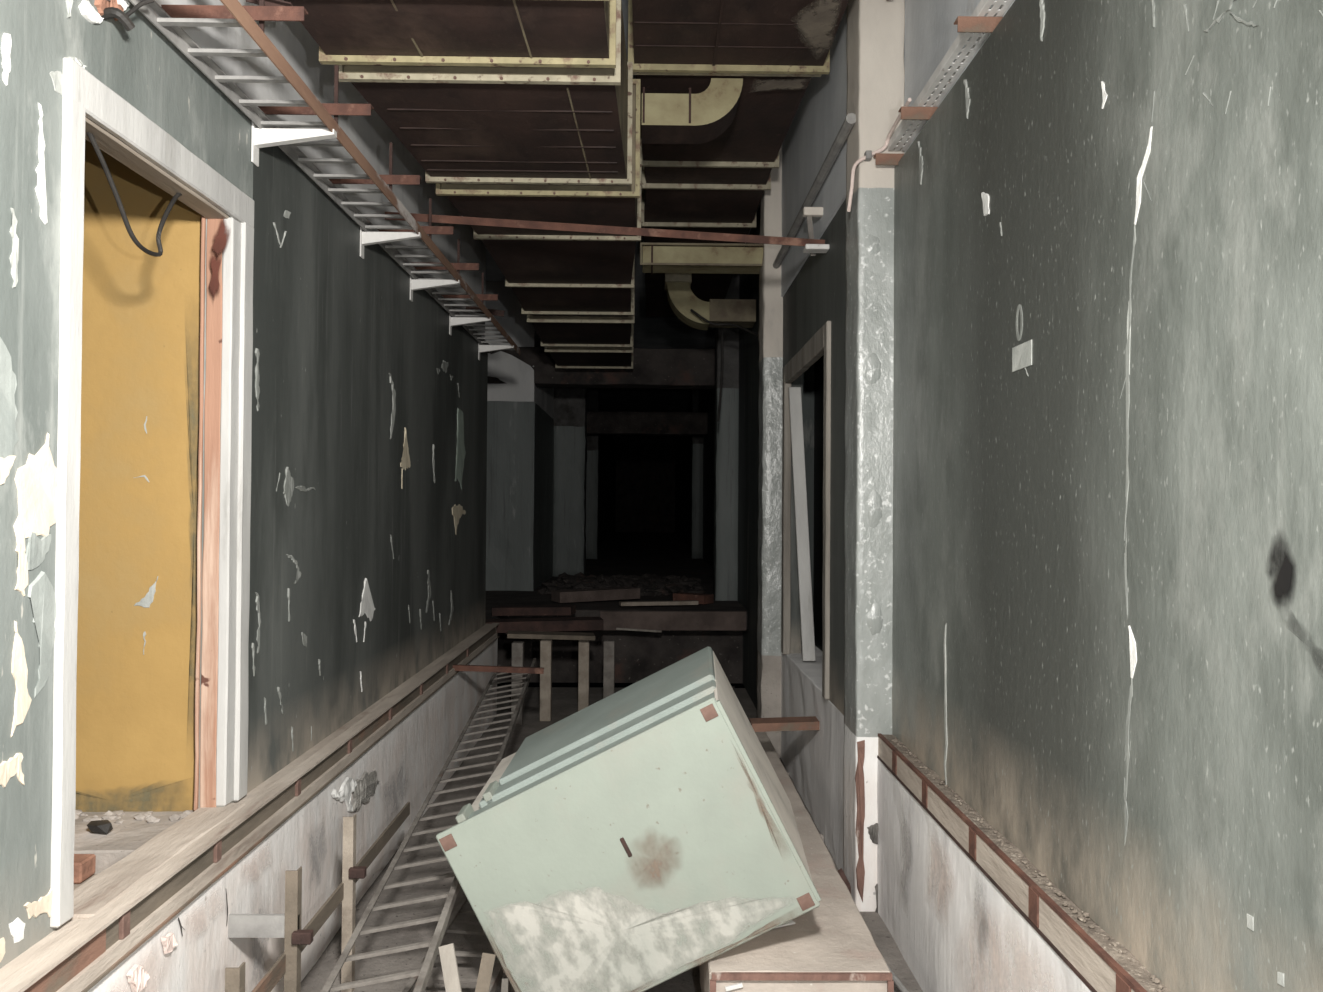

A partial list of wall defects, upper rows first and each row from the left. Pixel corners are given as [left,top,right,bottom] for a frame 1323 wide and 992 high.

flaking render [65,0,130,24]
peeling [1,33,12,85]
peeling [35,103,48,224]
peeling [10,208,19,288]
rust [209,219,229,296]
peeling [389,373,411,489]
peeling [437,360,466,533]
peeling [276,467,316,506]
peeling [0,337,59,737]
peeling [353,578,375,642]
leakage [1269,541,1294,604]
peeling [0,753,25,788]